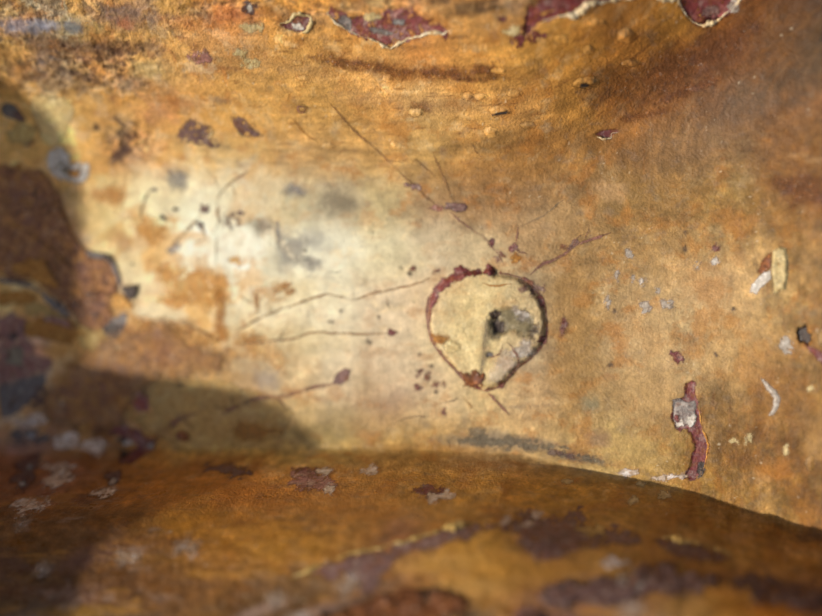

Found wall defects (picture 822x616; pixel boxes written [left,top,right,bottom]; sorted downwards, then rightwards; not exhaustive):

peeling [326,6,451,50]
peeling [498,0,632,48]
peeling [658,0,740,28]
crack [331,105,471,229]
corrosion [0,164,137,346]
corrosion [137,217,164,242]
water stain [220,210,245,229]
crack [489,226,611,275]
crack [180,279,426,344]
corrosion [3,265,229,457]
crack [169,368,351,428]
peeling [619,381,710,499]